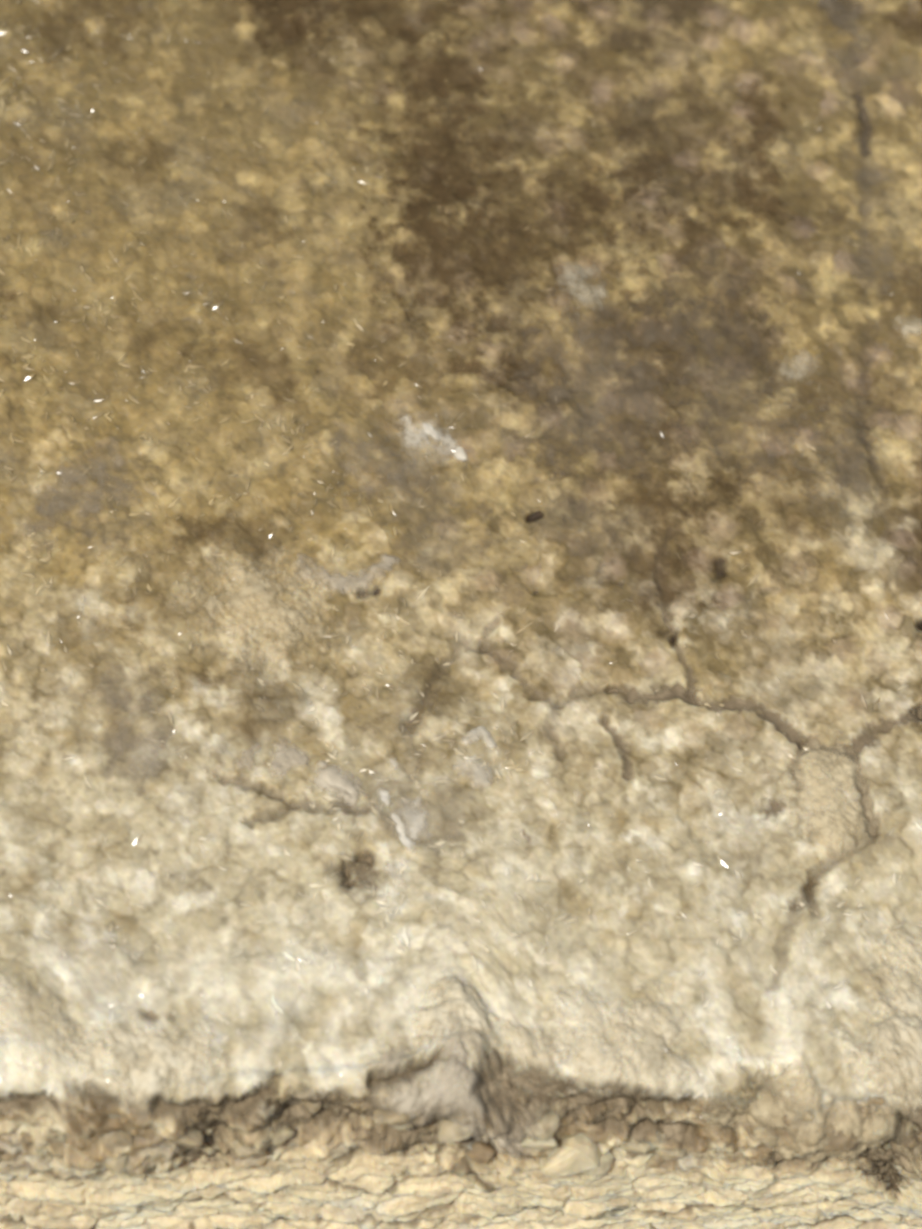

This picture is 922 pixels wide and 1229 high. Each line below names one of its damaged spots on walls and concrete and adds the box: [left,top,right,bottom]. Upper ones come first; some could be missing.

damp [737,76,781,218]
damp [453,358,535,385]
crack [602,530,922,839]
spalling [0,1031,922,1229]